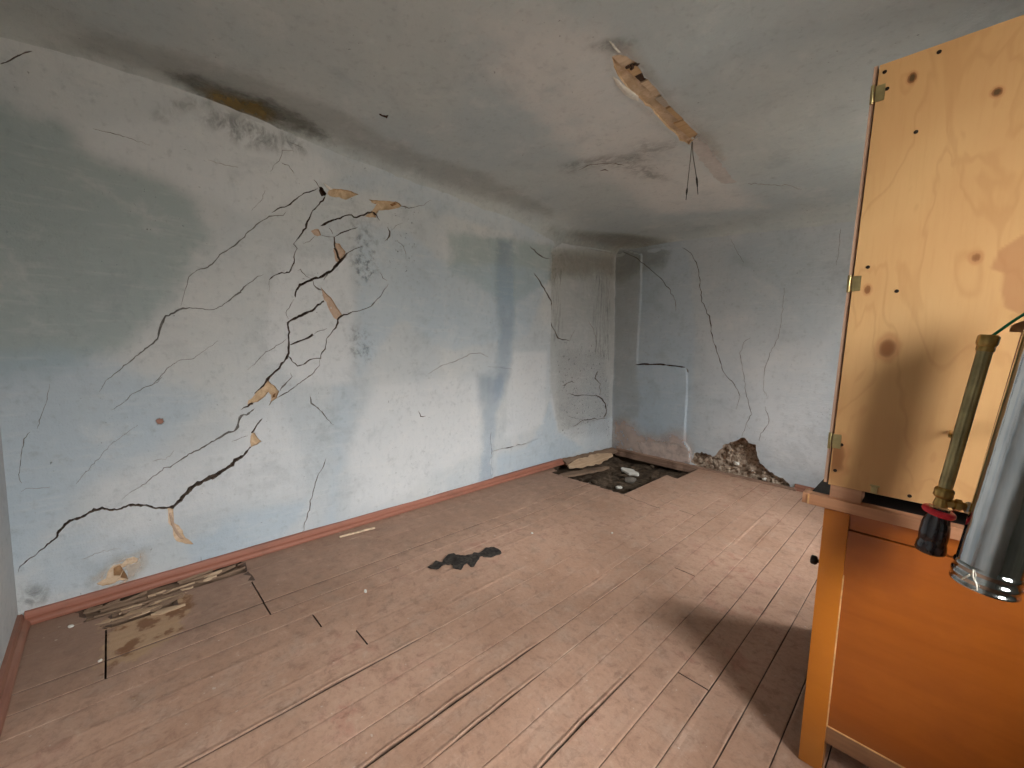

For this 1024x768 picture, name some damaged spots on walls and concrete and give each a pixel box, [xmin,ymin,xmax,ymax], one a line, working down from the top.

damp [181,77,321,135]
spalling [319,183,401,218]
spalling [321,288,342,320]
crack [18,143,429,572]
crack [635,363,689,372]
crack [684,248,784,439]
spalling [248,381,279,405]
spalling [691,437,790,487]
peeling [167,508,193,544]
peeling [97,557,139,586]